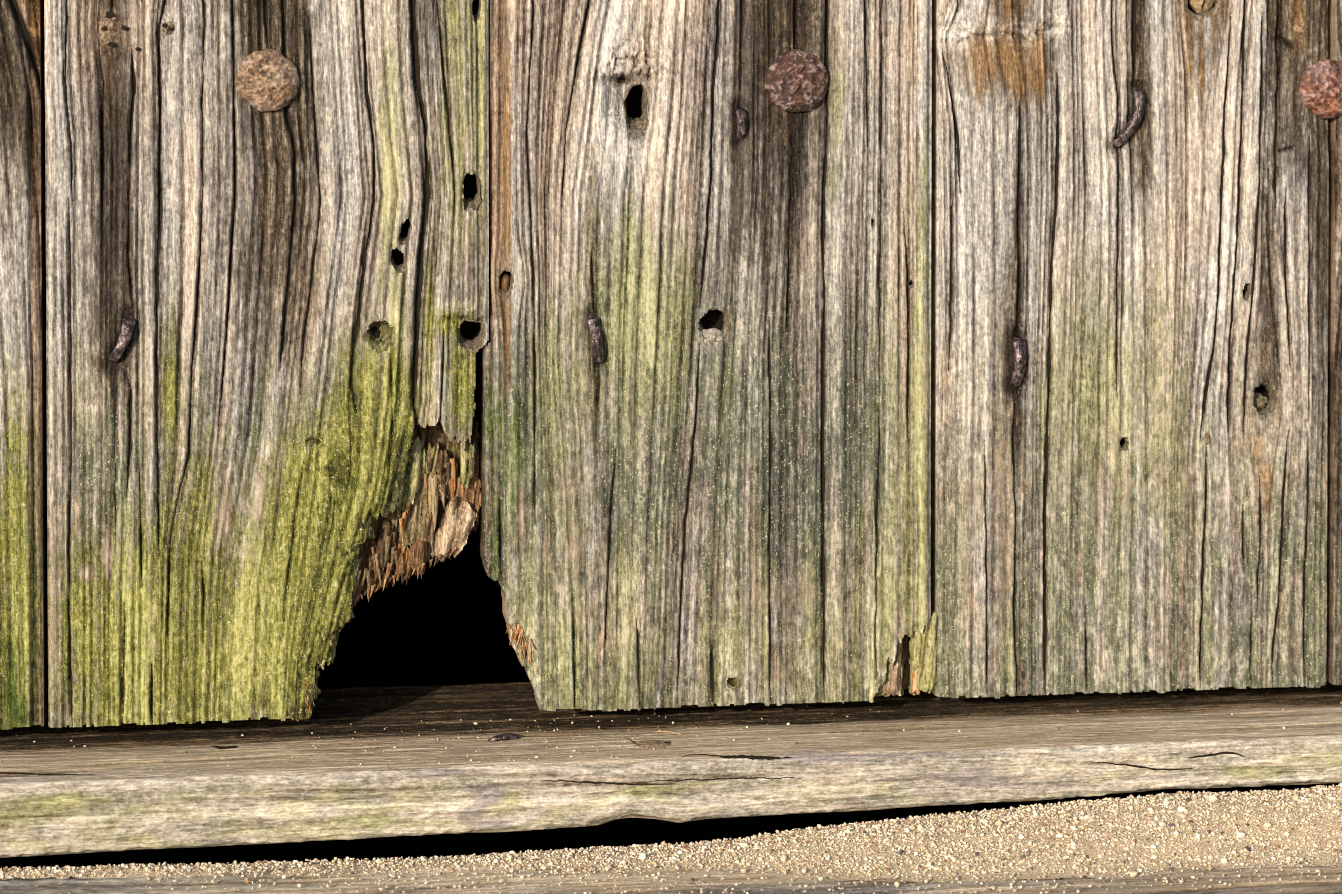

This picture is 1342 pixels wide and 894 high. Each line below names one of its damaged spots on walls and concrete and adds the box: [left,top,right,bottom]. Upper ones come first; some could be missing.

corrosion [93,53,138,399]
corrosion [220,0,322,343]
spalling [292,413,481,722]
peeling [517,487,525,549]
peeling [565,529,584,572]
corrosion [581,161,599,416]
corrosion [744,0,834,246]
spalling [873,610,937,698]
corrosion [995,192,1024,607]
corrosion [1129,0,1153,195]
corrosion [1267,0,1342,476]